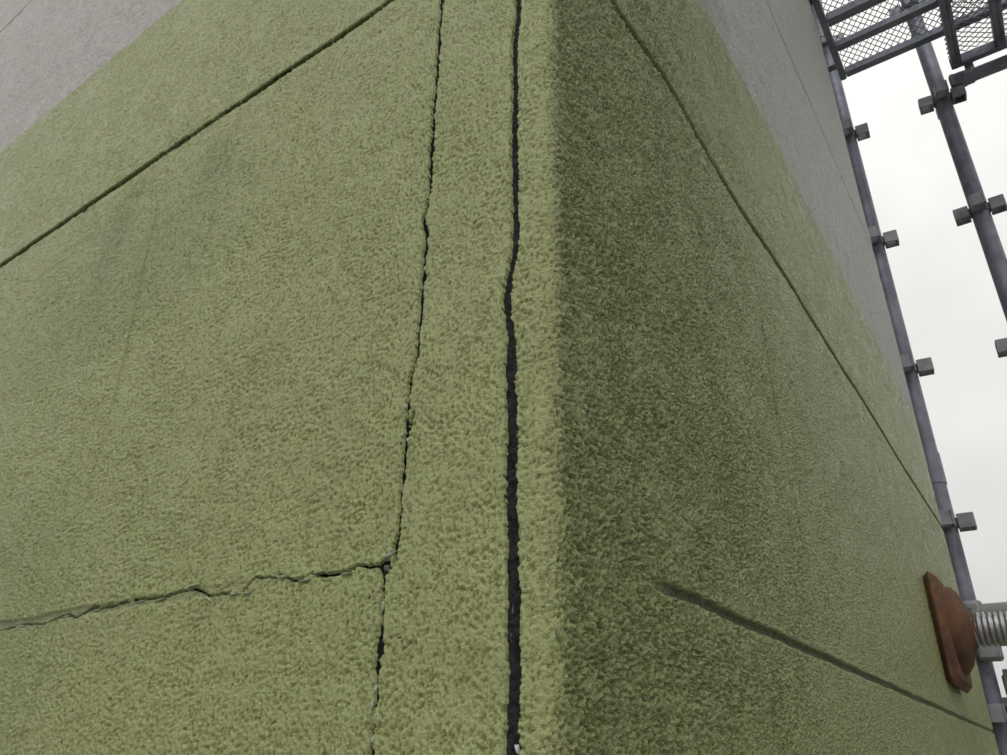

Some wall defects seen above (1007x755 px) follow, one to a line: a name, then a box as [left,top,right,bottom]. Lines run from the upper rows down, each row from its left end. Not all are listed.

crack [18,0,444,755]
crack [503,0,522,755]